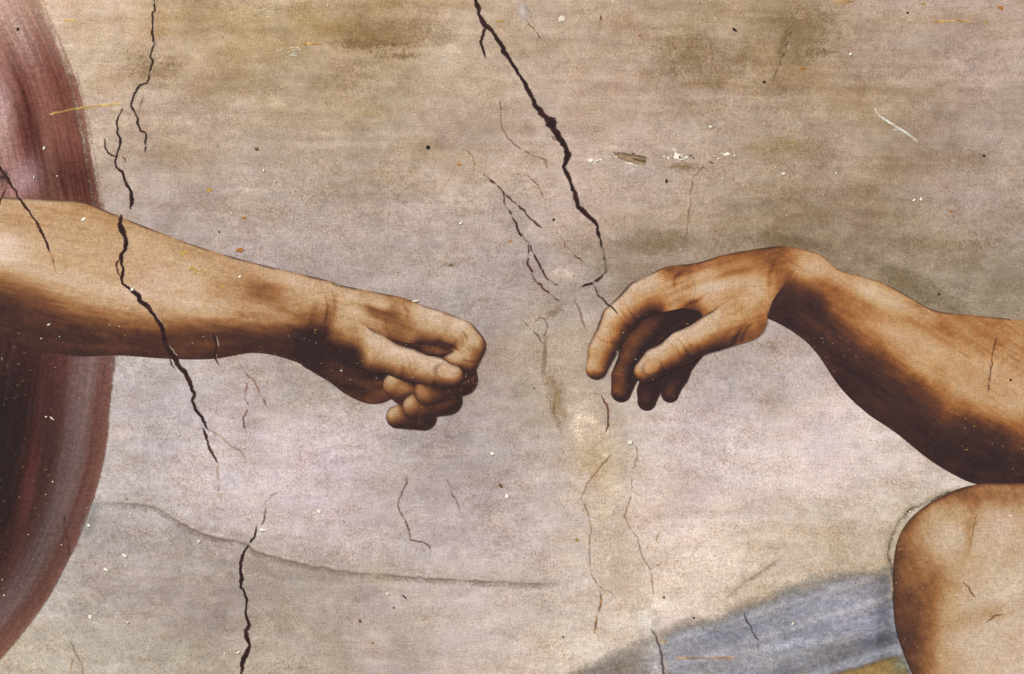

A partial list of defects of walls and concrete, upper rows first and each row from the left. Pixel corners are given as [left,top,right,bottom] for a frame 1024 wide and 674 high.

crack [0,166,56,272]
crack [104,0,266,498]
crack [465,0,618,343]
crack [988,339,997,391]
crack [239,492,277,674]
crack [397,476,430,548]